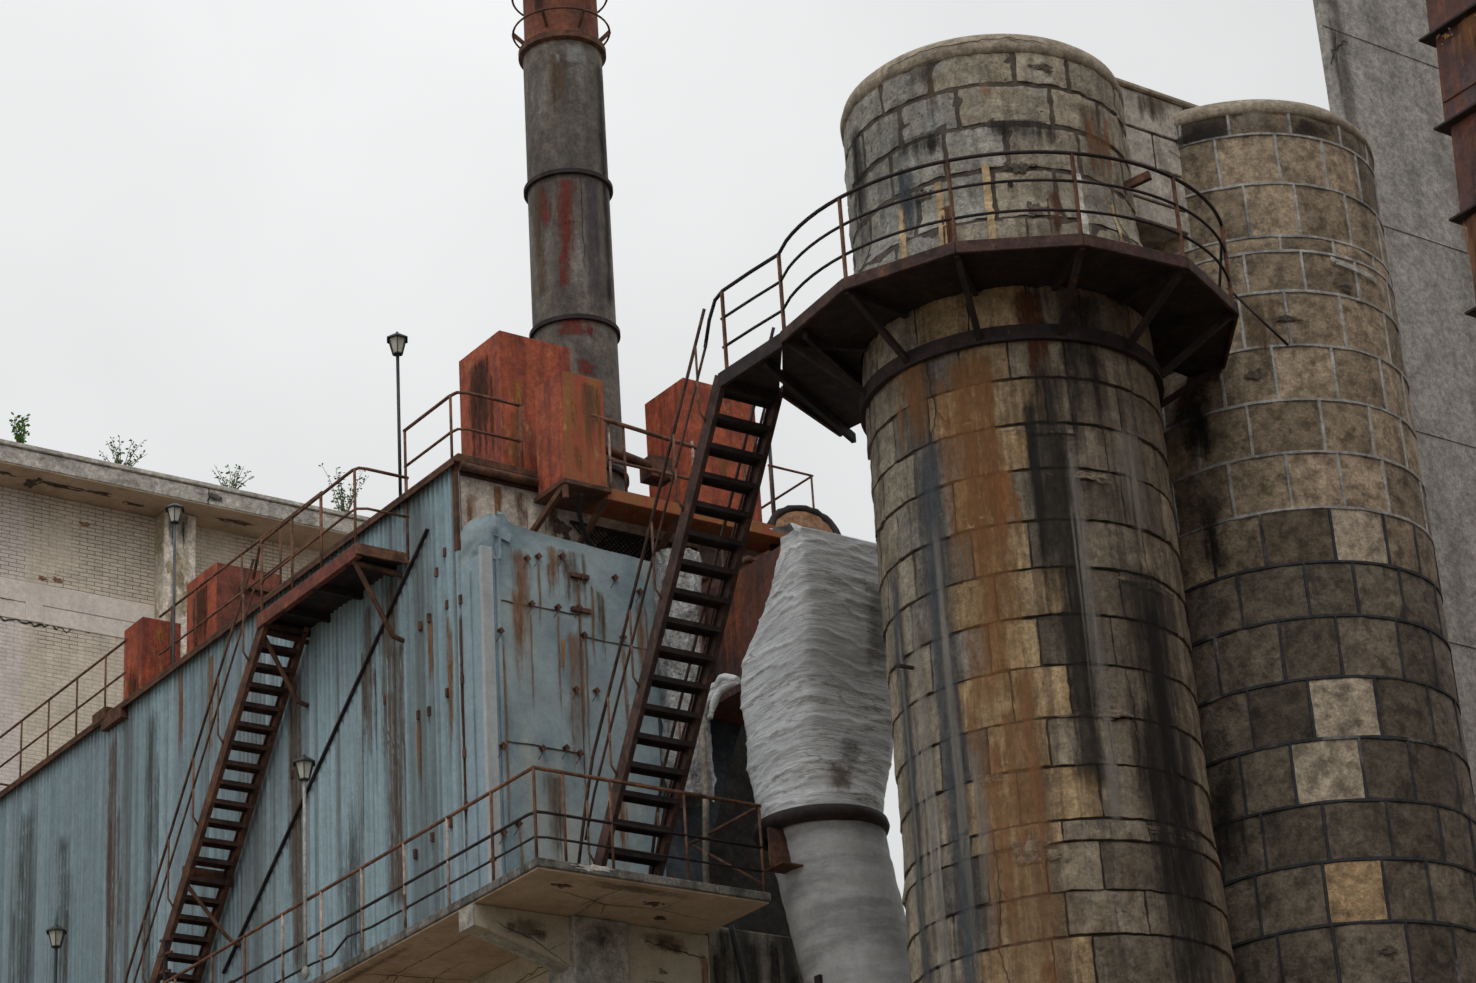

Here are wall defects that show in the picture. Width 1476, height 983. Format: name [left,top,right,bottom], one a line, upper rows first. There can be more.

corrosion [1016,290,1049,373]
damp [1025,404,1046,551]
corrosion [503,508,605,798]
damp [1144,613,1204,905]